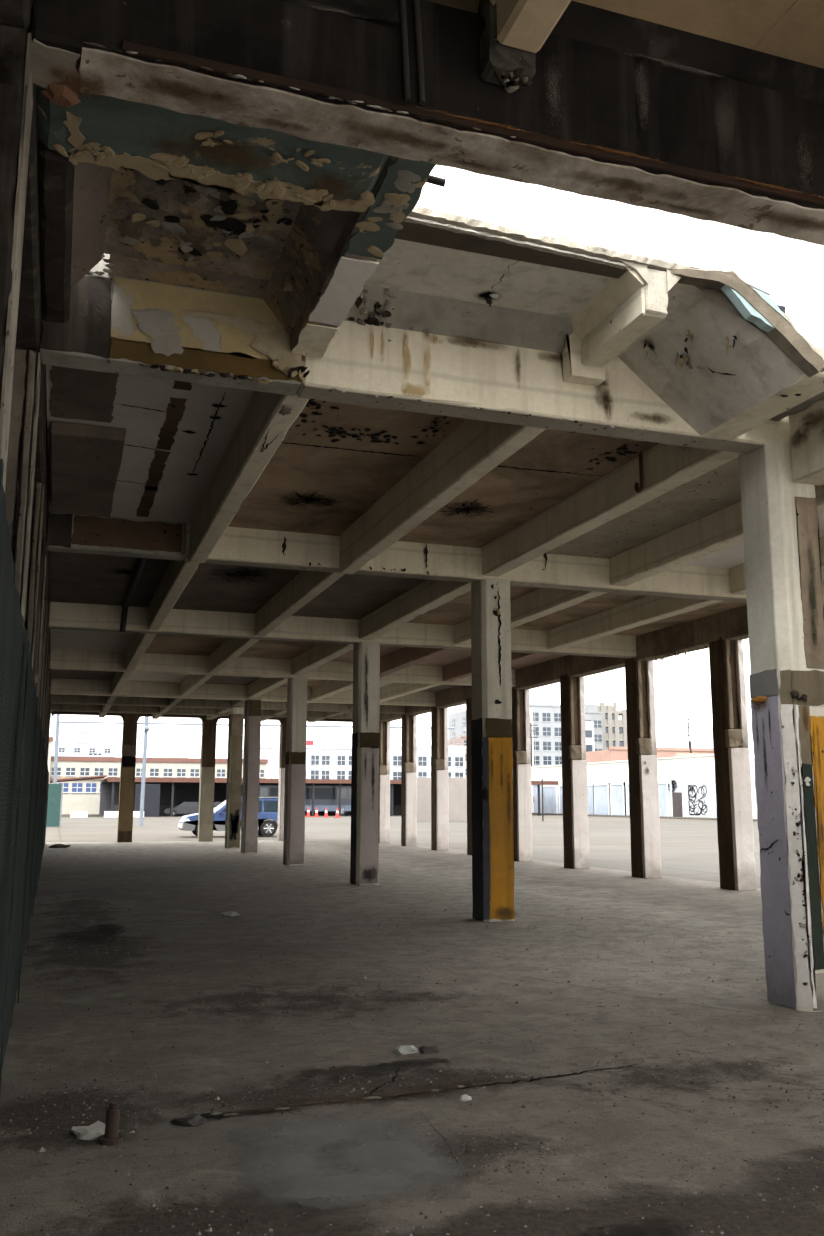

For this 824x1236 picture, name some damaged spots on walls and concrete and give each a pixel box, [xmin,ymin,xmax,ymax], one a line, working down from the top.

spalling [179,61,431,119]
peeling [52,111,421,259]
spalling [348,281,397,328]
peeling [131,308,310,384]
crack [200,1060,653,1188]